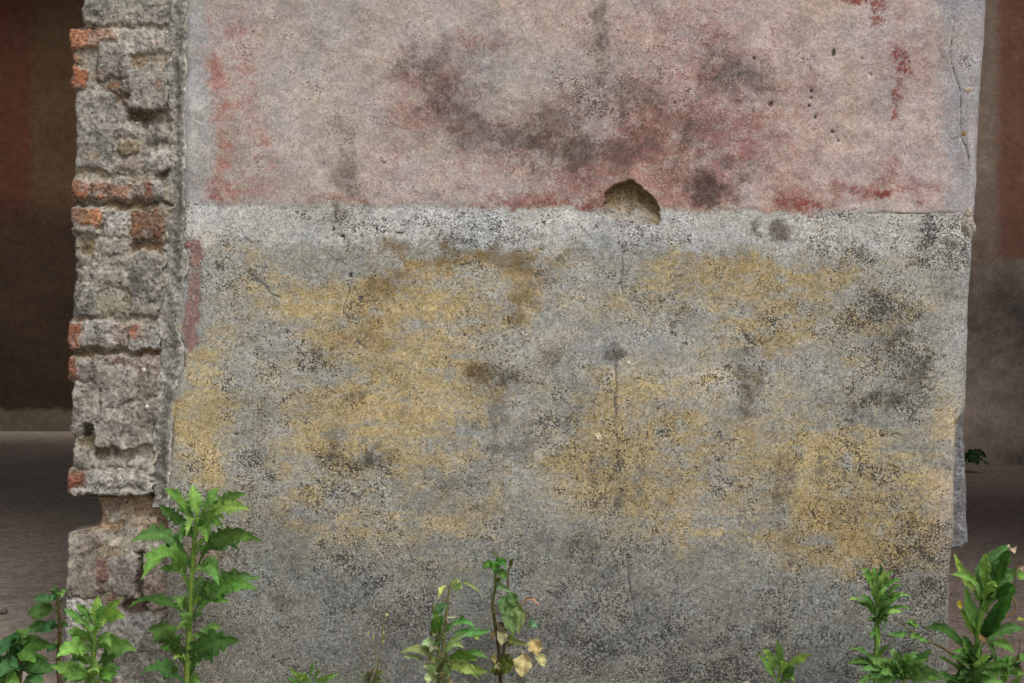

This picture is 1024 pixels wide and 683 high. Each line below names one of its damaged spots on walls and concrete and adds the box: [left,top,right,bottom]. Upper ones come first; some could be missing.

water stain [437,105,593,170]
spalling [602,179,662,225]
water stain [684,171,735,208]